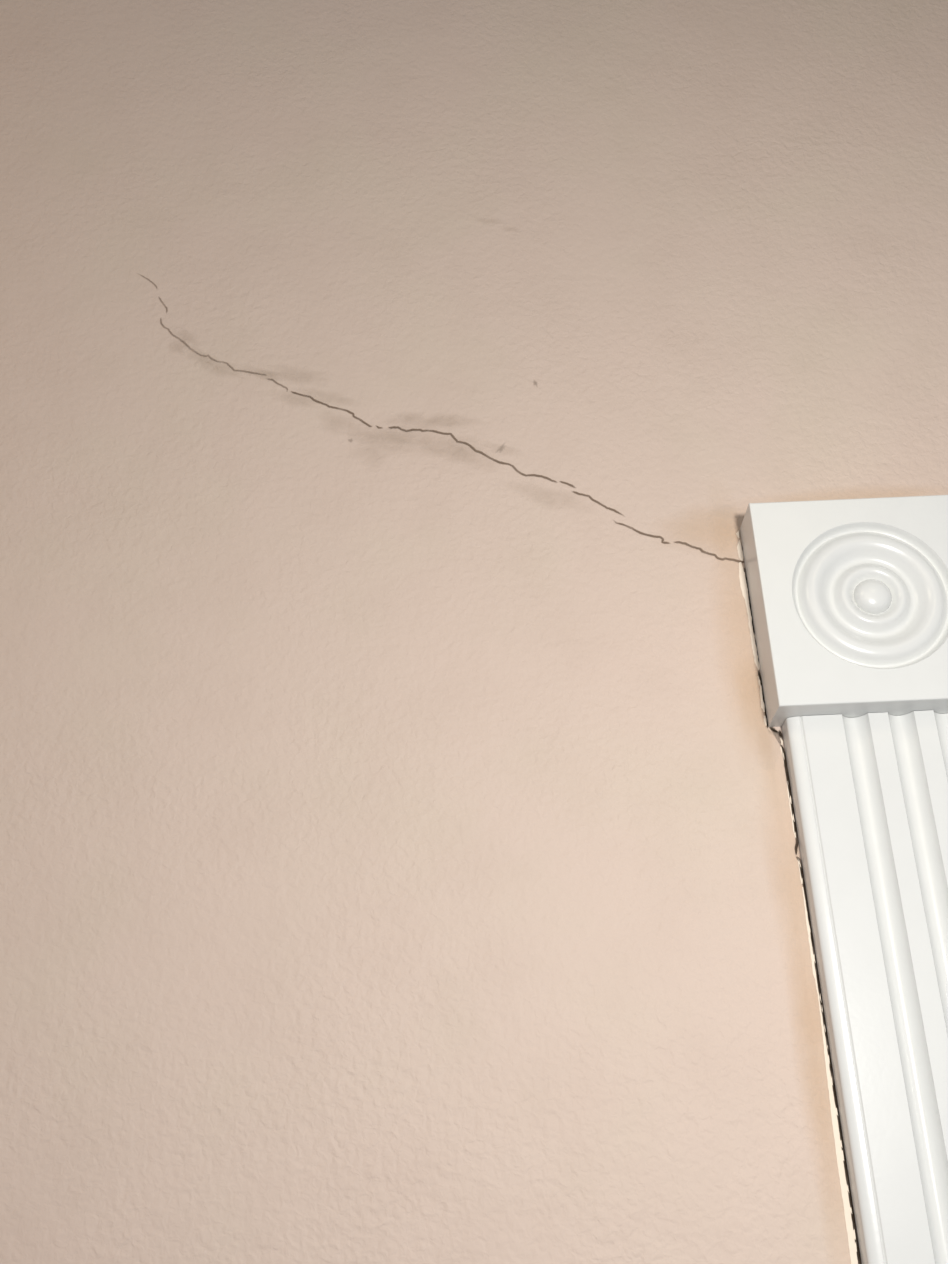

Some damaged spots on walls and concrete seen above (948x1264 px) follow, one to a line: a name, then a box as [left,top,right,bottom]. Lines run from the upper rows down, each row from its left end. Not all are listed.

crack [143,276,862,1264]